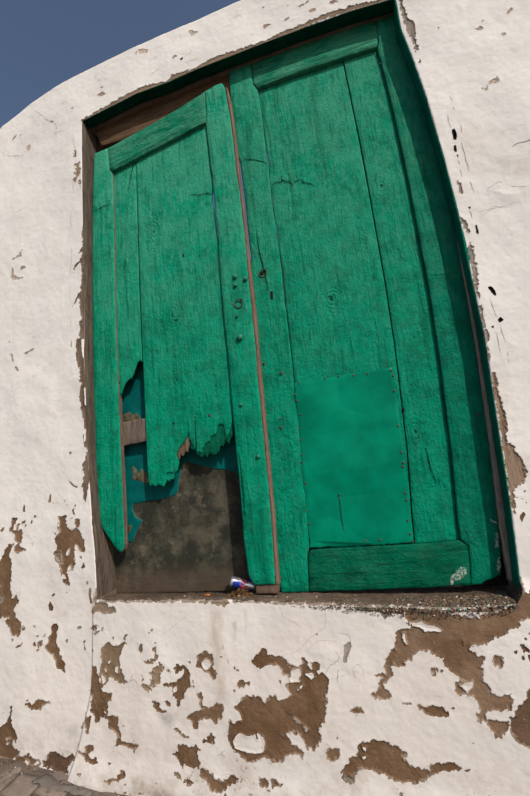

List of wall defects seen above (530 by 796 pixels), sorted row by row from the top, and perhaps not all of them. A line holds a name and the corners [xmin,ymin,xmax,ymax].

peeling [81,0,386,122]
peeling [399,0,421,63]
peeling [460,217,491,361]
peeling [492,372,528,522]
peeling [0,505,68,673]
peeling [25,699,52,711]
peeling [0,706,98,777]
peeling [77,581,139,753]
peeling [104,770,144,795]
peeling [138,629,471,796]
peeling [371,590,530,749]